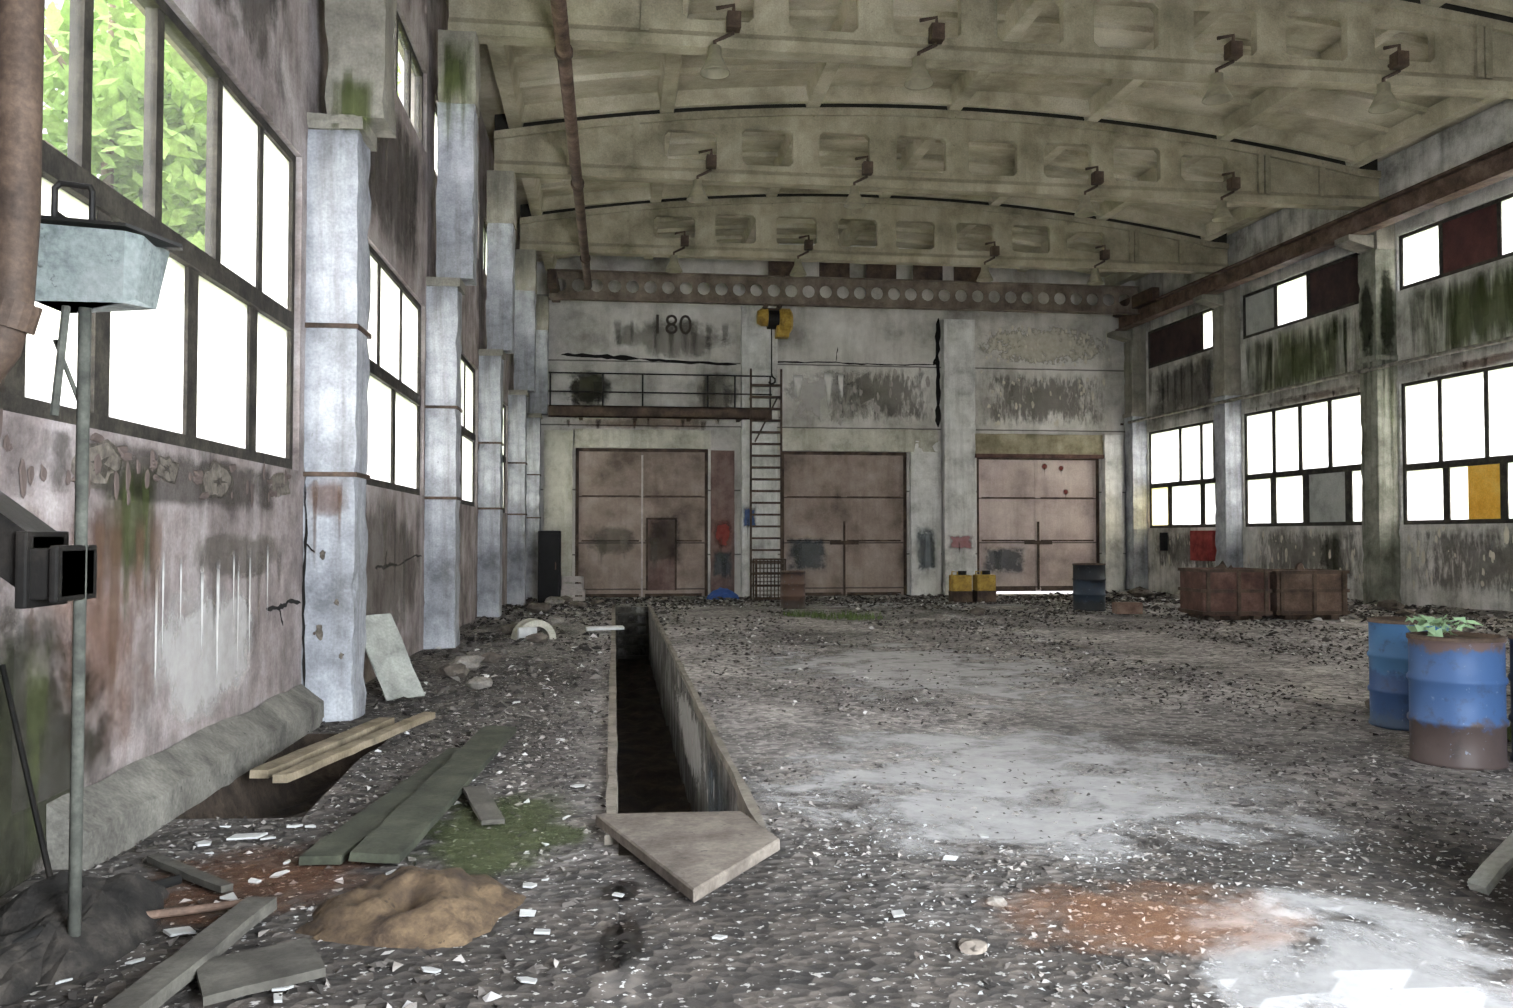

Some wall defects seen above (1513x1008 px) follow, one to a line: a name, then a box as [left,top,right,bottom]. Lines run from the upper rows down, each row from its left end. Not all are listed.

leakage [791,375,860,418]